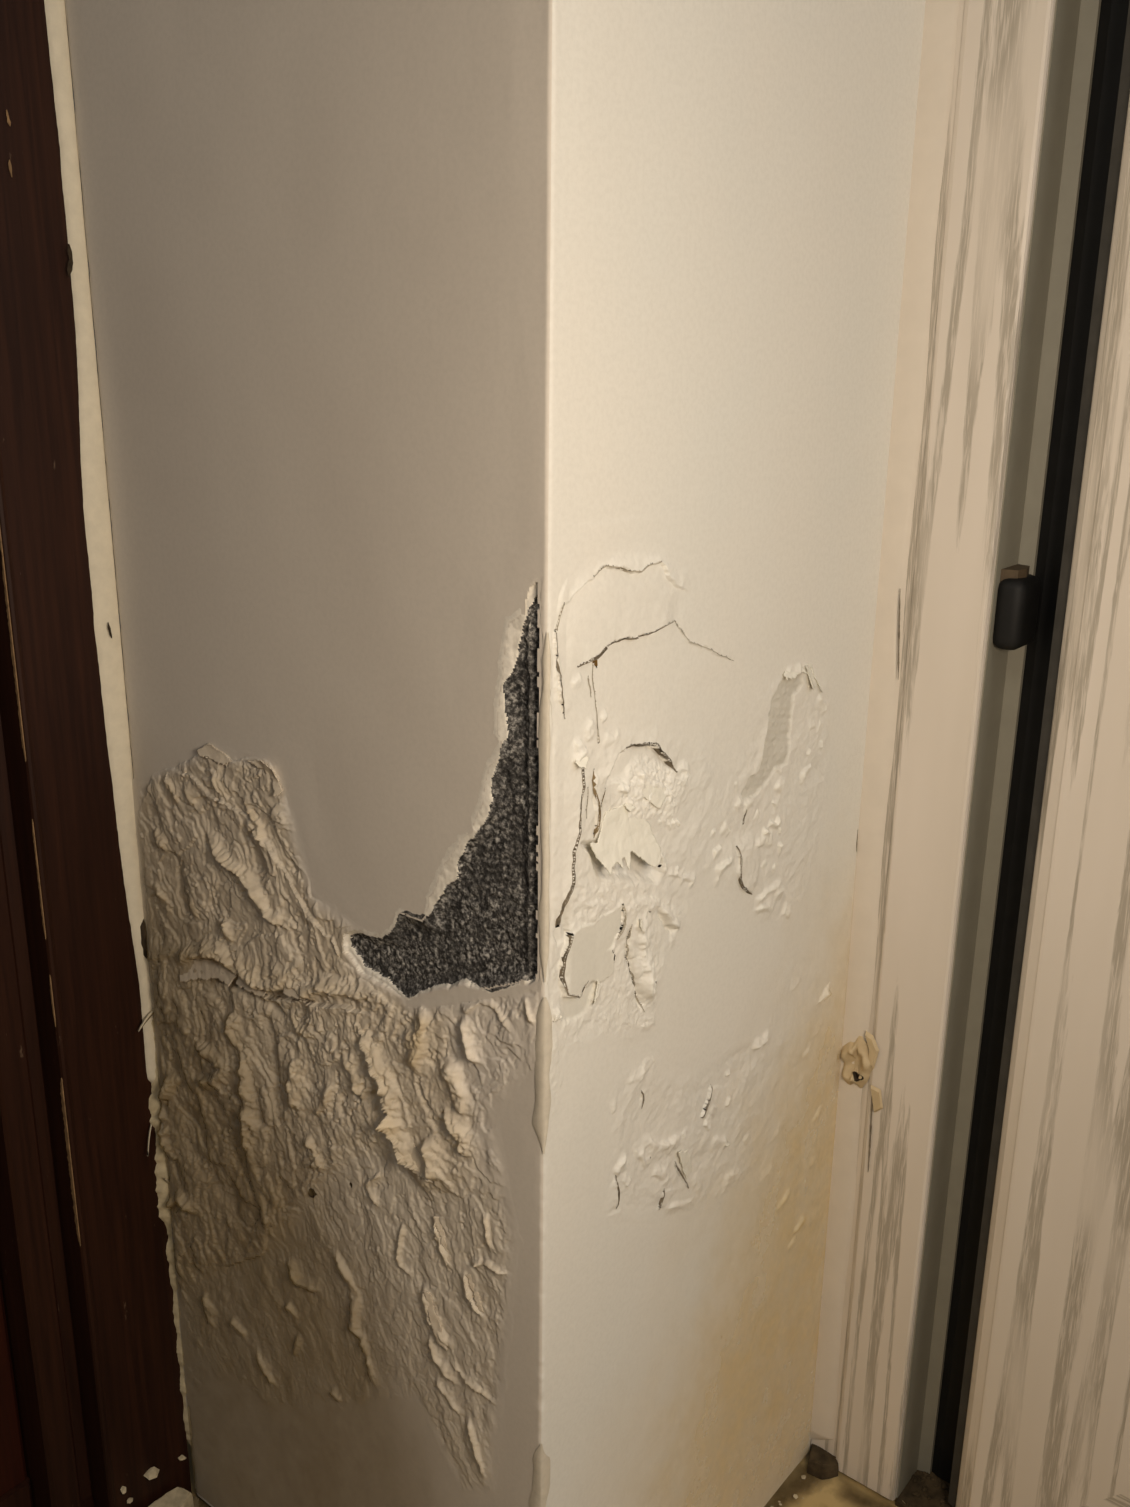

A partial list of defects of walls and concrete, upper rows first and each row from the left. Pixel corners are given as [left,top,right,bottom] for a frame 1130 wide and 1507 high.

crack [594,562,661,577]
crack [555,604,734,1012]
spalling [132,572,836,1507]